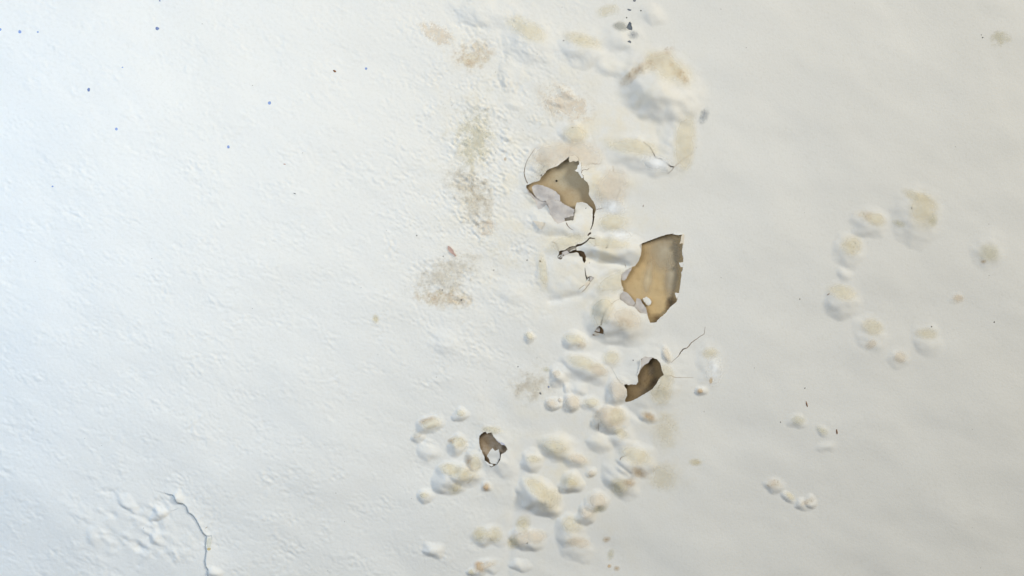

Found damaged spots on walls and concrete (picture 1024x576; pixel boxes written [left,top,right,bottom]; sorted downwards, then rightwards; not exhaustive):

peeling [520,134,607,224]
peeling [616,233,698,411]
peeling [470,418,522,472]
crack [172,495,212,576]